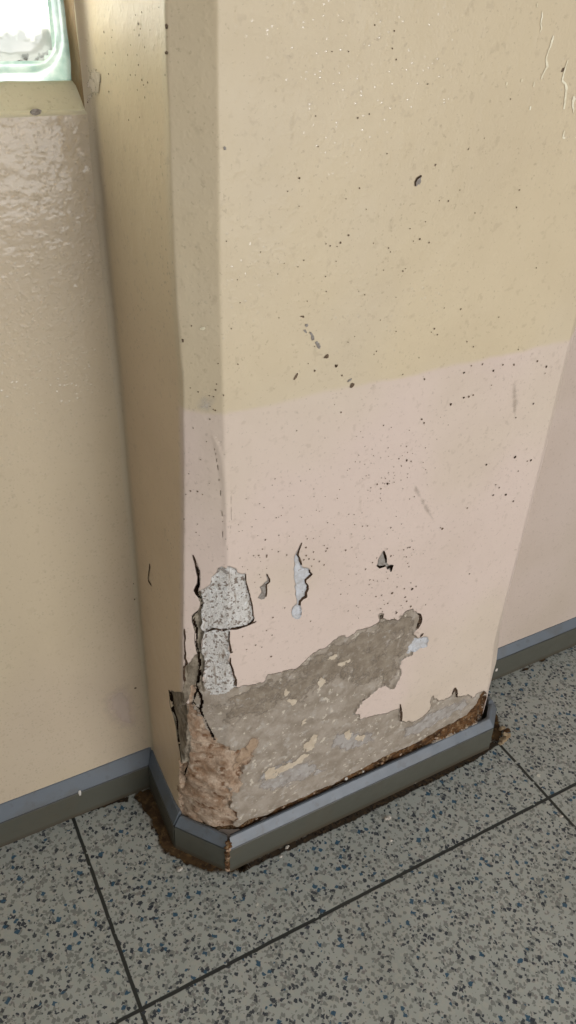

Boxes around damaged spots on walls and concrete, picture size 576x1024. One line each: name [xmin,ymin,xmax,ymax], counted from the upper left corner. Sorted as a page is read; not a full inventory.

crack [168,555,256,780]
peeling [292,543,313,619]
spalling [169,567,487,827]
peeling [377,551,394,572]